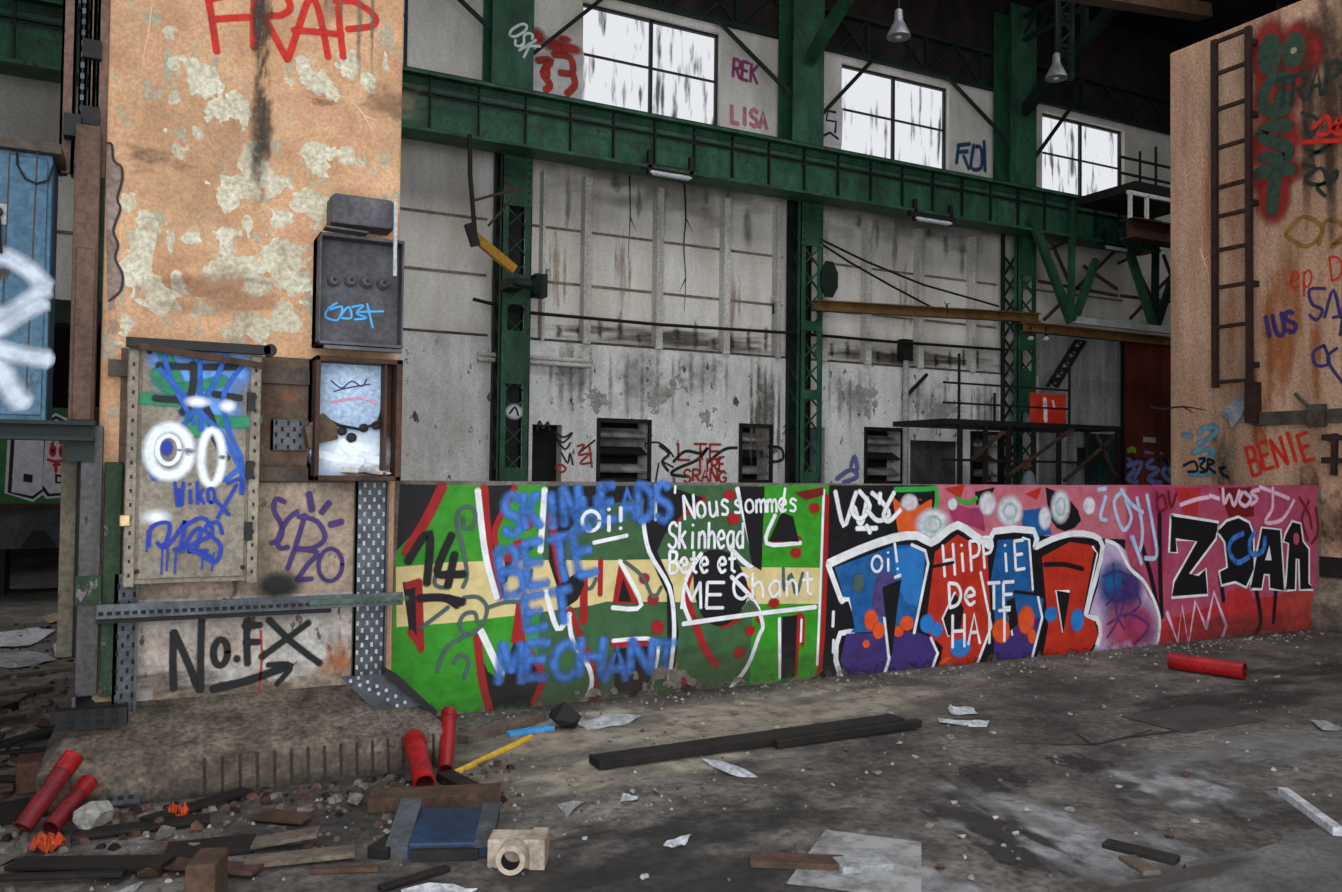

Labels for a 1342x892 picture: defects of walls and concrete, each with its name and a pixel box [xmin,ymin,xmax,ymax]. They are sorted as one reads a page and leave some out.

leakage [252,0,273,174]
peeling [106,25,389,345]
leakage [750,368,780,478]